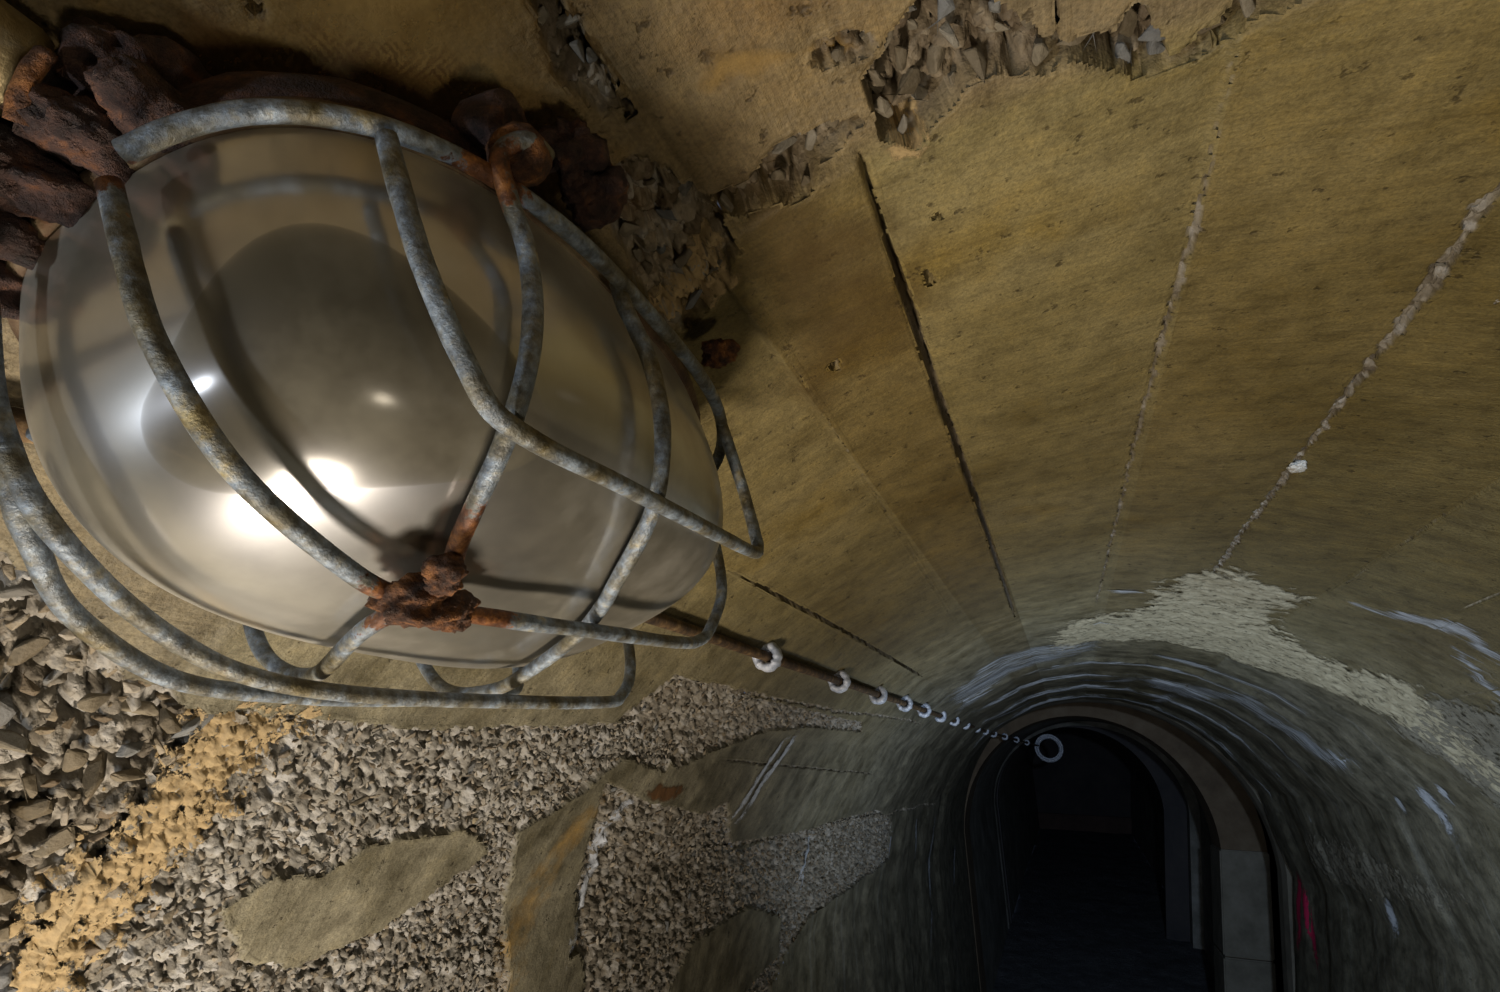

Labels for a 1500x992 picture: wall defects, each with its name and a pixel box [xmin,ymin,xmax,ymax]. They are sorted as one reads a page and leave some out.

spalling [512,0,1324,336]
crack [1206,167,1500,577]
water stain [952,622,1360,771]
water stain [1352,603,1500,696]
water stain [1415,786,1453,834]
water stain [1385,899,1398,933]